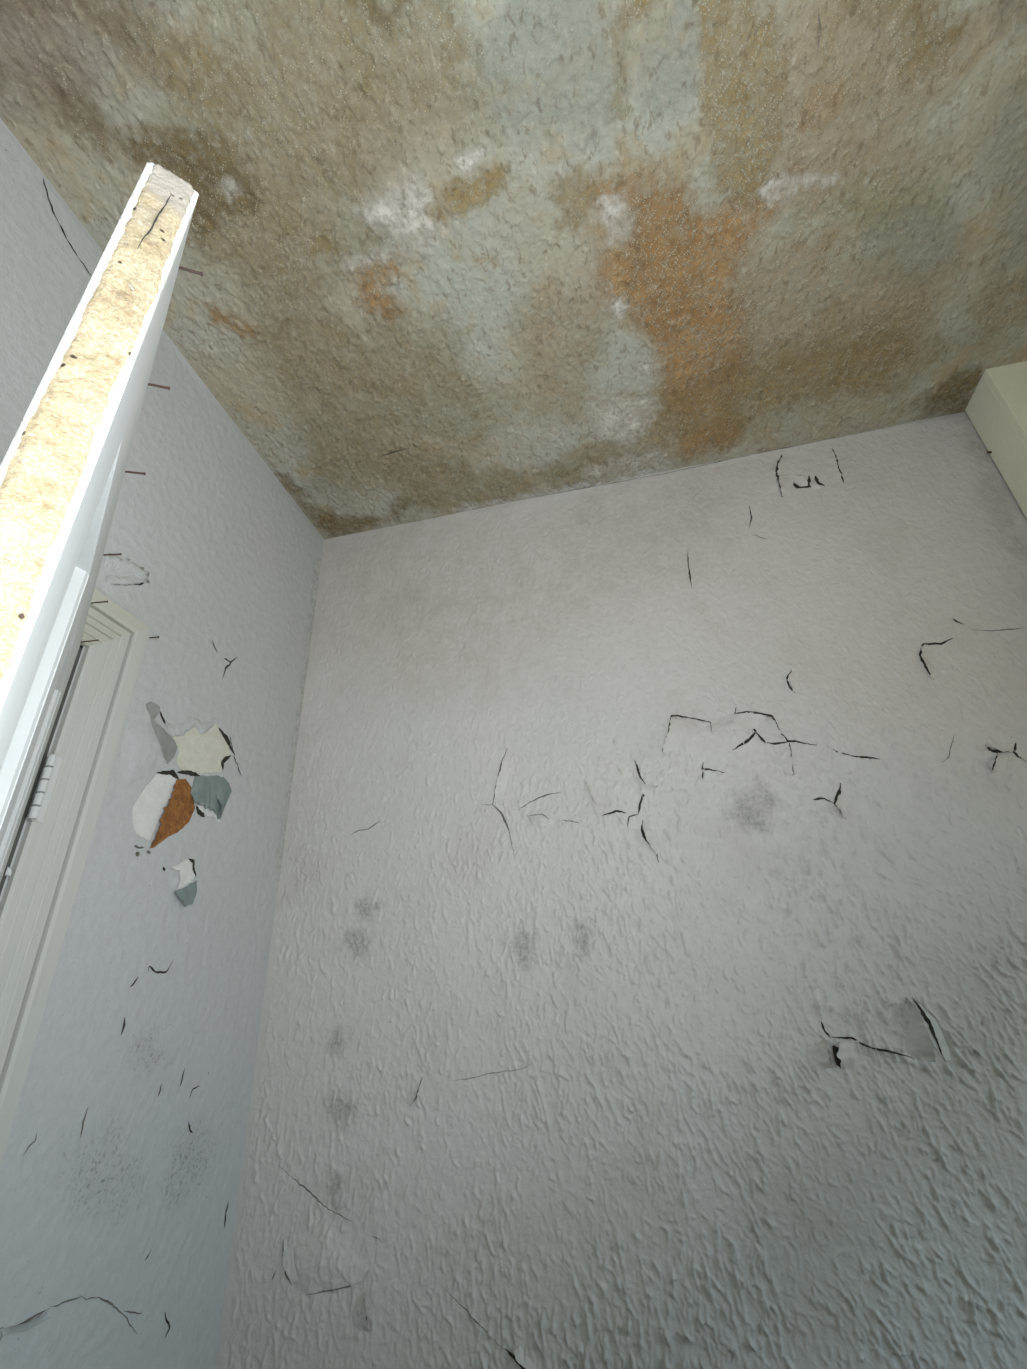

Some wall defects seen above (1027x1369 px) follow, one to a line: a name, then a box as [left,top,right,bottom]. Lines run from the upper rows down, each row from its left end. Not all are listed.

water stain [0,0,158,150]
water stain [126,0,468,294]
water stain [430,166,505,223]
water stain [647,0,933,444]
water stain [926,370,982,413]
peeling [761,448,844,497]
spalling [132,702,235,857]
spalling [163,858,198,907]
peeling [805,997,952,1072]
crack [0,1296,171,1340]